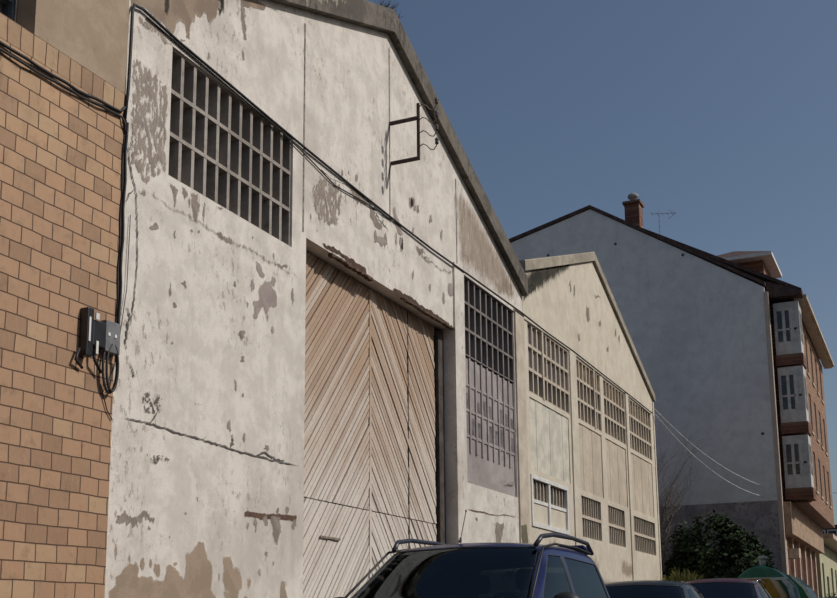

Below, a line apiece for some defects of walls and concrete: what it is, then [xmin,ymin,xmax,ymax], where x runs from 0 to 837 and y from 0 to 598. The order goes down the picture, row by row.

peeling [131,0,219,45]
peeling [241,0,266,10]
peeling [129,59,168,183]
peeling [170,184,206,233]
peeling [310,169,414,252]
spalling [323,243,366,273]
peeling [247,262,277,334]
peeling [143,391,162,417]
crack [127,412,298,466]
spalling [116,510,155,530]
corrosion [245,507,297,545]
peeling [109,541,261,598]